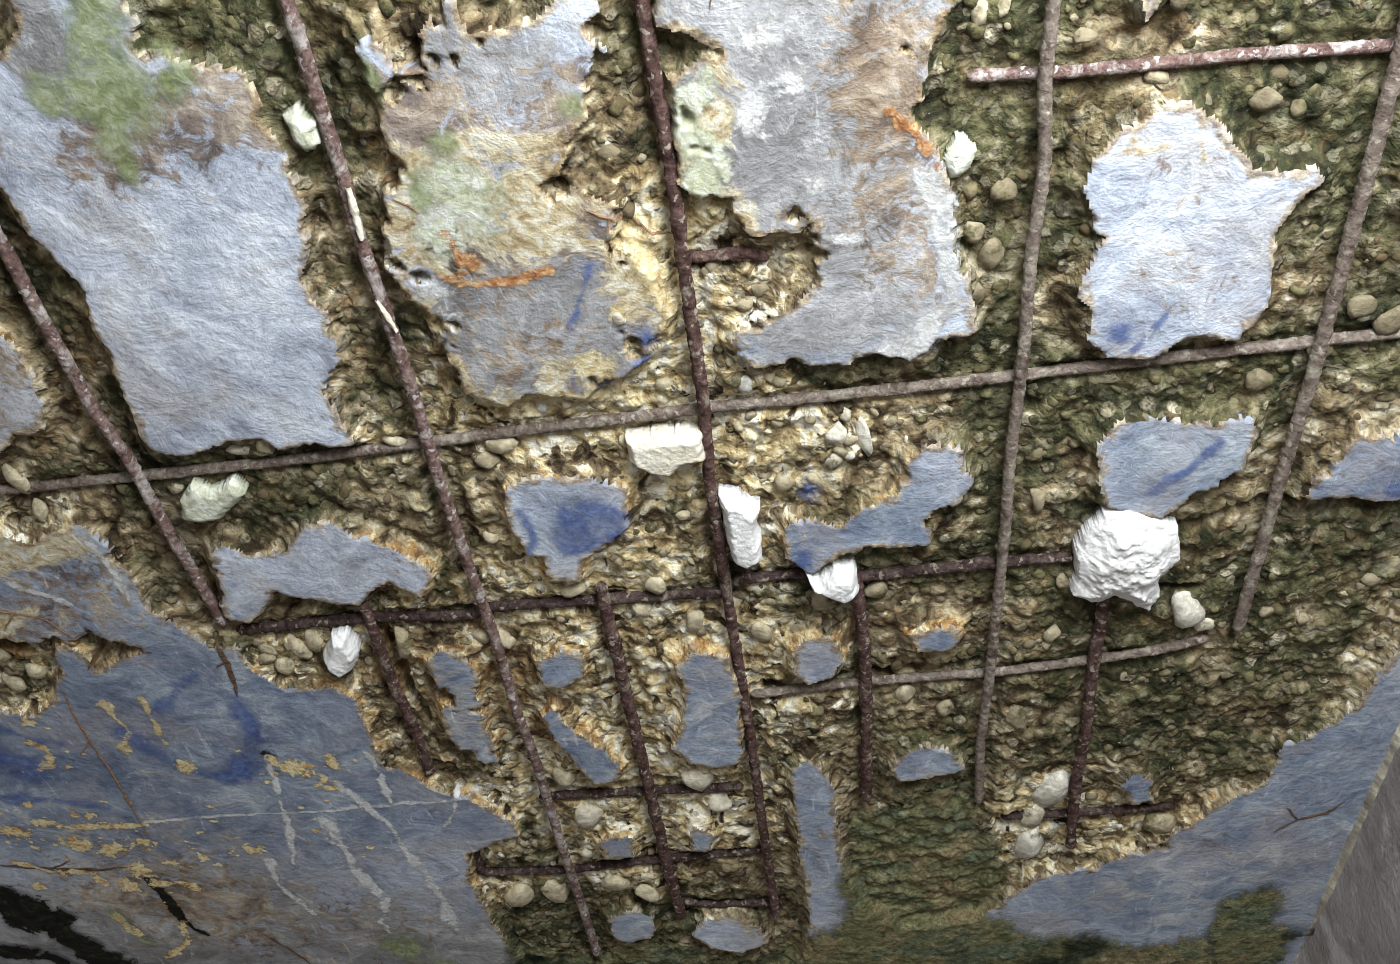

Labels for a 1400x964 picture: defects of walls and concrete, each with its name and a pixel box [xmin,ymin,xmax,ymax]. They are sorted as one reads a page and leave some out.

rust [883,107,942,172]
rust [439,230,555,289]
spalling [0,0,984,964]
spalling [427,0,1400,920]
rust [21,690,87,773]
rust [176,759,198,773]
leakage [95,673,515,936]
rust [260,746,358,802]
rust [0,800,272,903]
rust [111,912,144,937]
rust [165,920,193,958]